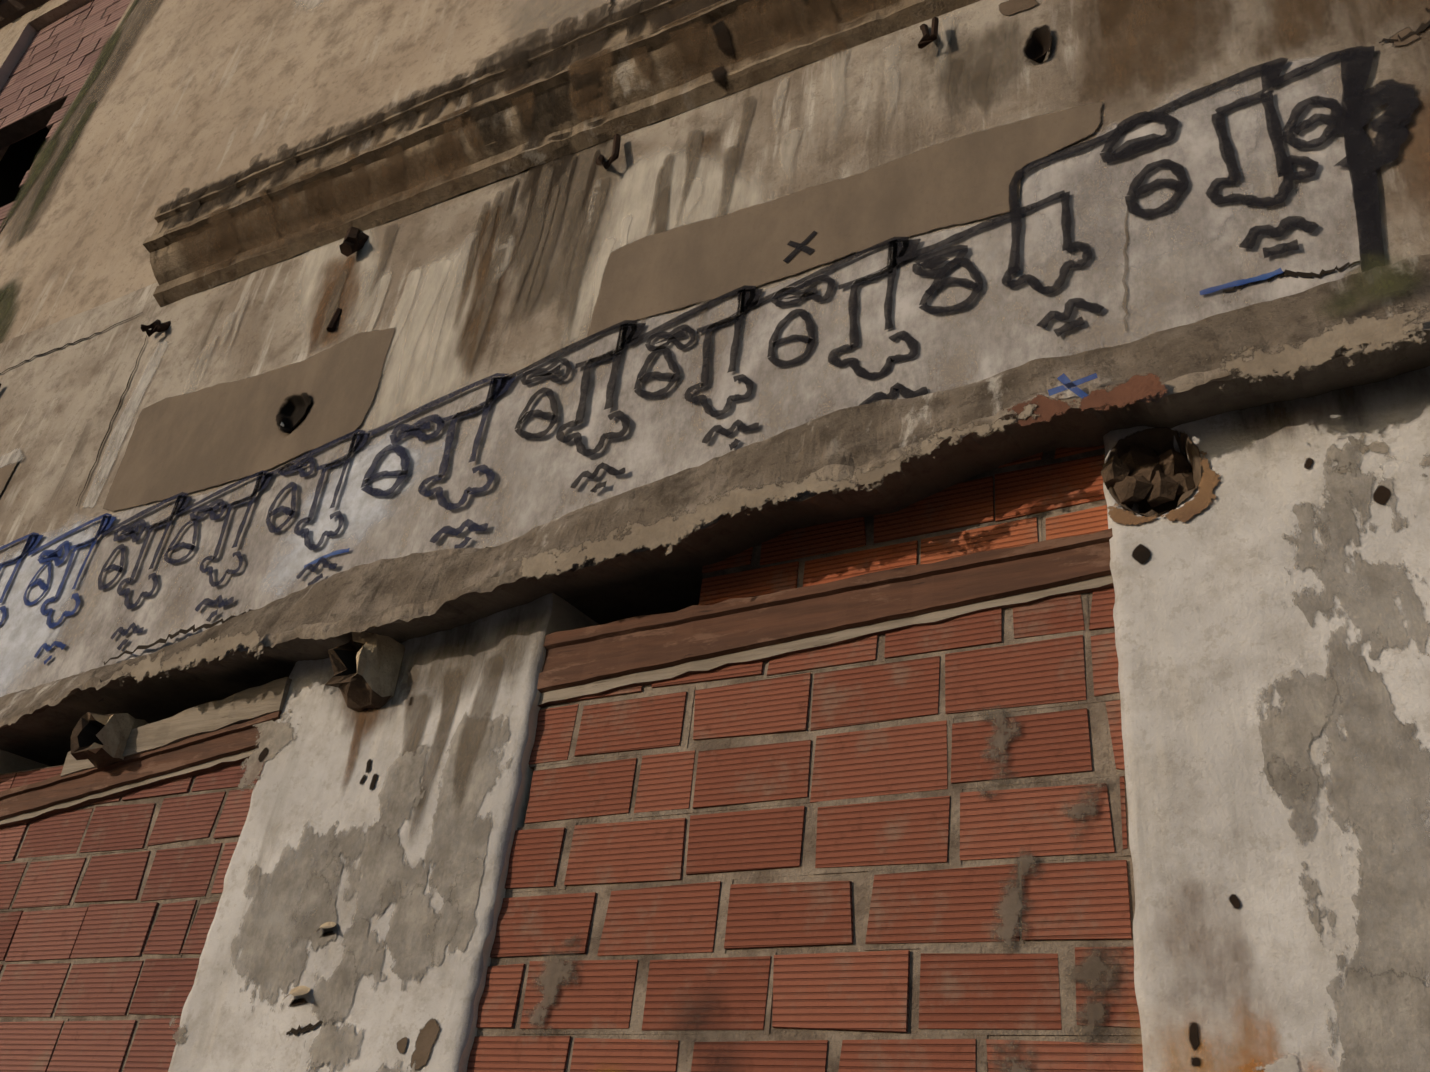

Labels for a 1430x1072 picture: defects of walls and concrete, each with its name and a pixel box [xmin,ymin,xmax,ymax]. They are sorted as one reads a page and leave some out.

leakage [924,18,1016,108]
leakage [1086,0,1197,96]
leakage [1260,0,1324,55]
crack [1379,7,1430,43]
leakage [1405,105,1430,192]
leakage [159,0,894,427]
leakage [1240,401,1295,430]
spalling [512,373,1167,579]
hole [1101,427,1220,525]
peeling [1256,434,1430,1072]
peeling [223,709,511,1072]